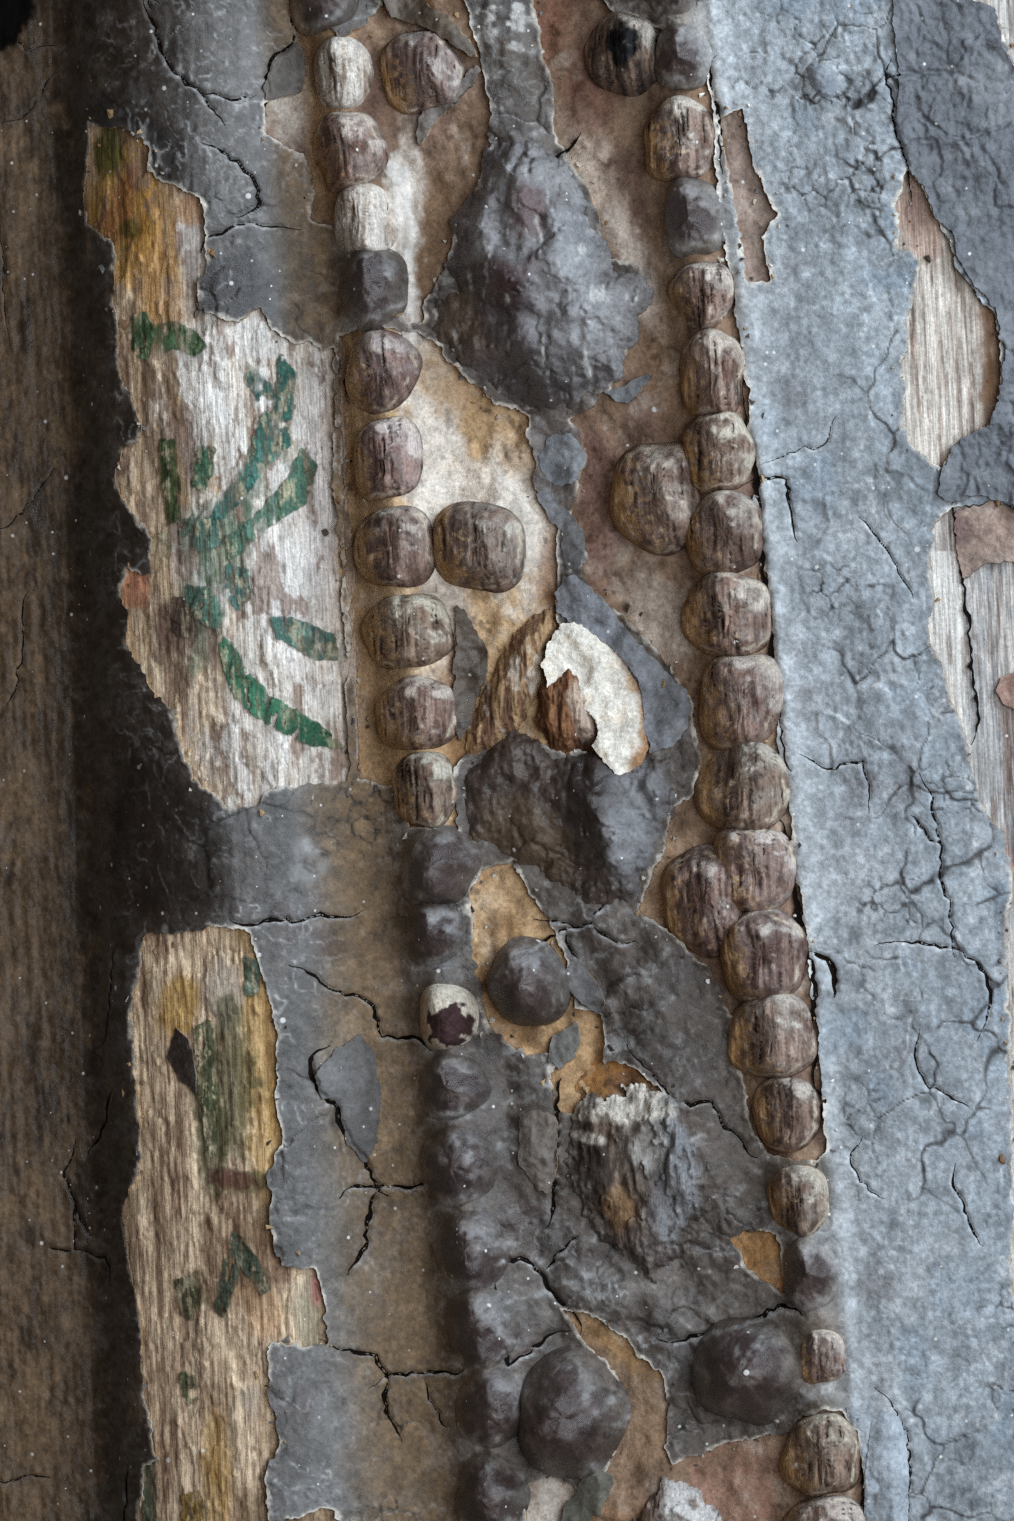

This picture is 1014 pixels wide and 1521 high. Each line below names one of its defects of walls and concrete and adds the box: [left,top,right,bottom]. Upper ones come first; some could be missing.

crack [143,0,302,254]
peeling [84,0,780,809]
crack [741,390,835,658]
peeling [892,0,1014,1293]
crack [952,502,981,745]
peeling [123,926,340,1521]
crack [308,1045,423,1275]
peeling [470,861,662,1194]
peeling [770,808,793,840]
peeling [743,953,827,1161]
crack [793,885,838,1098]
crack [877,772,992,1041]